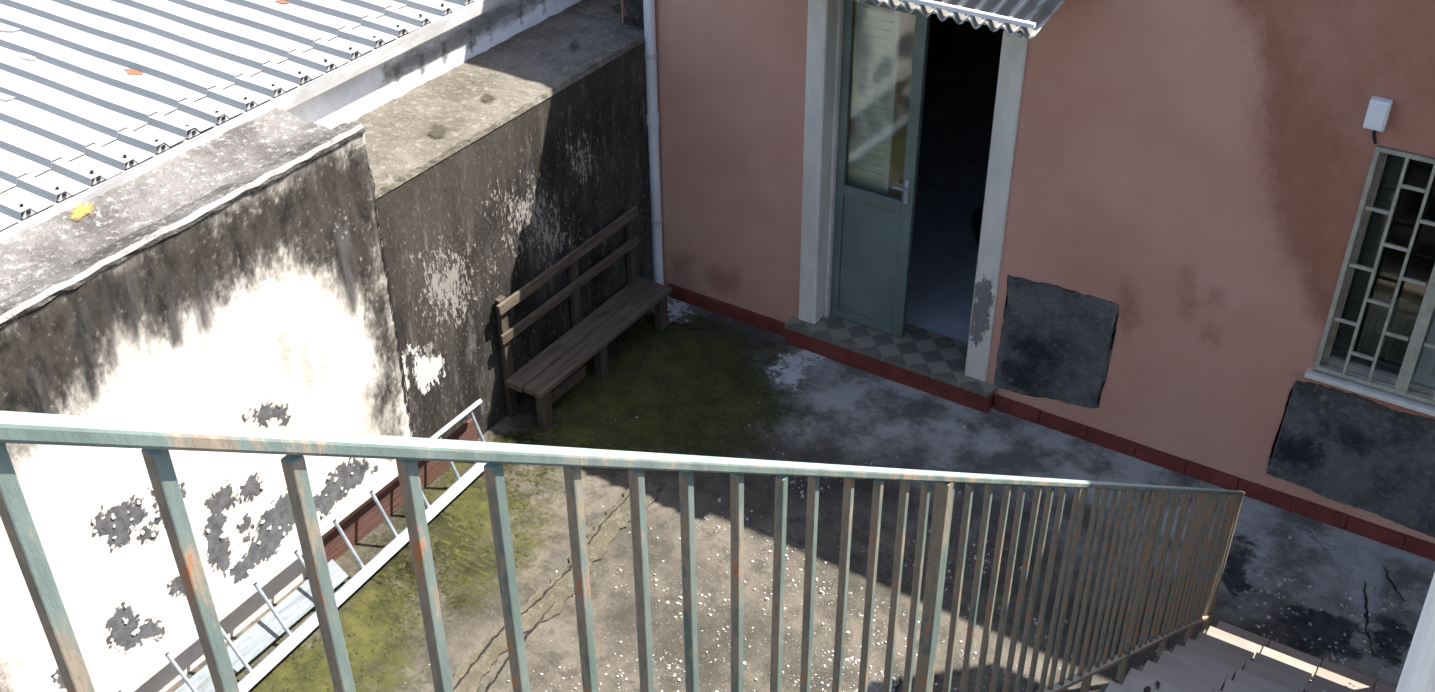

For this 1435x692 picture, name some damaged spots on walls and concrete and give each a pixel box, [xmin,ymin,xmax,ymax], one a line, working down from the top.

damp [0,144,400,436]
peeling [242,398,292,427]
peeling [87,487,165,549]
peeling [203,472,295,584]
peeling [313,457,378,518]
peeling [106,602,167,654]
peeling [167,575,185,596]
crack [453,494,630,692]
crack [1363,566,1404,655]